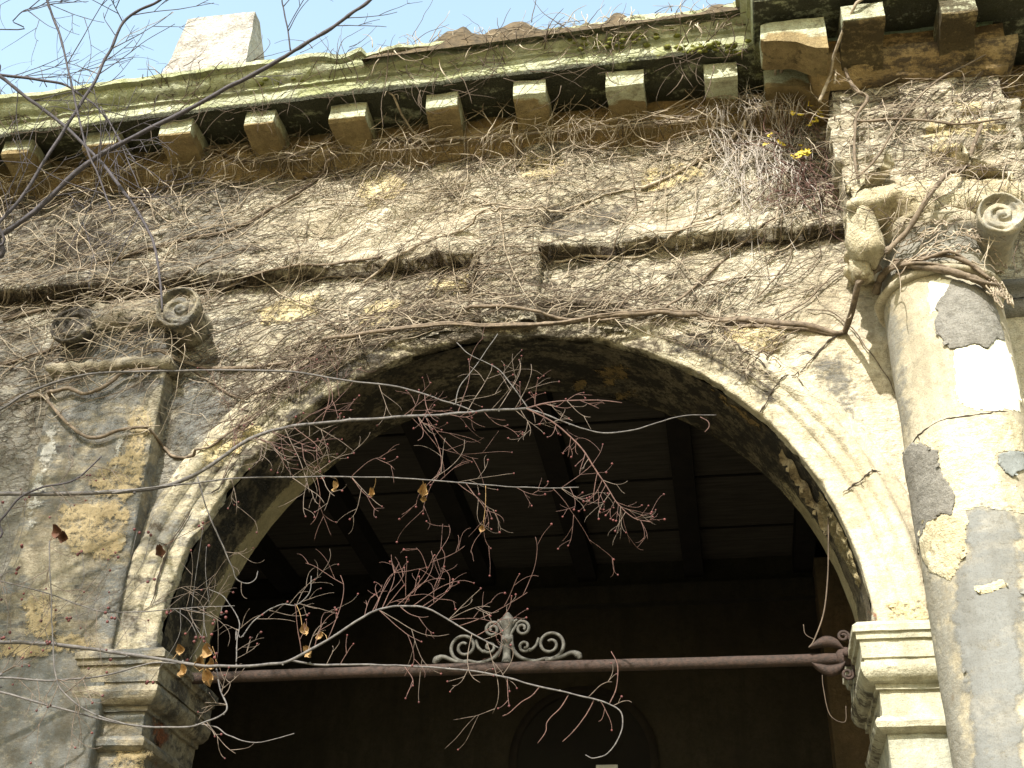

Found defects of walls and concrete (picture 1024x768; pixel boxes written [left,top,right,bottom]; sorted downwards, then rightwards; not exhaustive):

peeling [934,278,1005,350]
peeling [58,406,153,559]
spalling [779,449,861,588]
crack [842,469,881,493]
crack [912,411,1006,443]
peeling [902,413,1024,768]